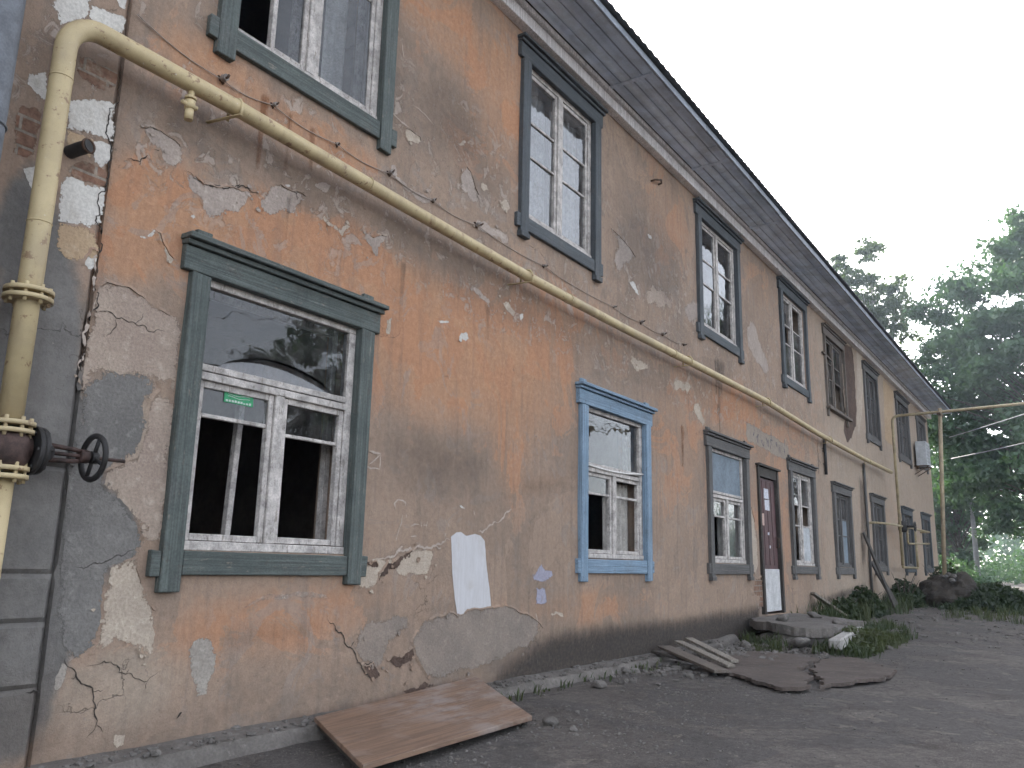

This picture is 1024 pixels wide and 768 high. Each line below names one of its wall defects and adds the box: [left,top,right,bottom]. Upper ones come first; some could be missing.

crack [78,72,163,370]
flaking render [141,124,330,219]
flaking render [459,165,488,202]
flaking render [359,543,437,594]
crack [64,657,156,737]
flaking render [89,556,157,666]
flaking render [188,637,216,697]
crack [329,622,372,678]
flaking render [360,604,563,694]